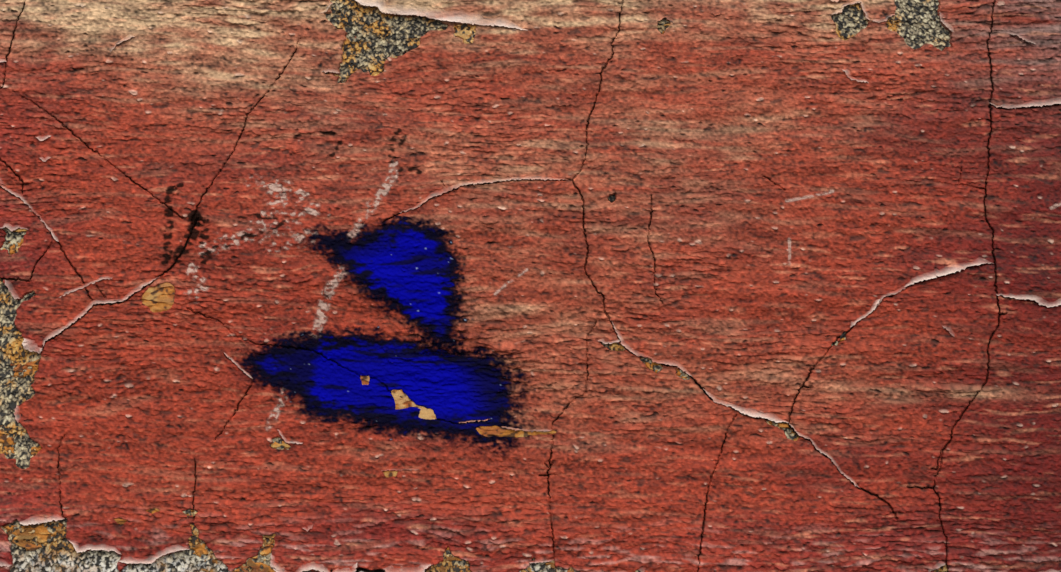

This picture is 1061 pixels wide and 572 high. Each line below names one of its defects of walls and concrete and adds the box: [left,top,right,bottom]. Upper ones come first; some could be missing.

crack [0,0,26,88]
flaking render [320,0,526,83]
flaking render [828,0,954,51]
crack [0,46,297,352]
crack [382,2,896,572]
crack [829,2,1061,571]
flaking render [0,279,42,469]
crack [224,339,336,428]
flaking render [0,510,357,572]
flaking render [383,547,471,572]
flaking render [520,558,578,572]
flaking render [928,560,948,572]